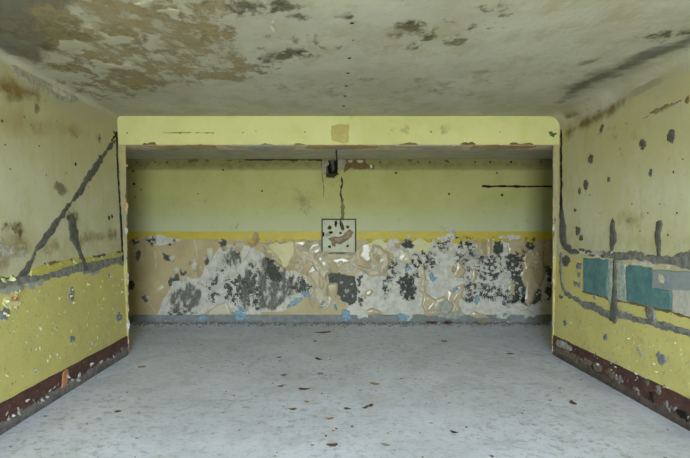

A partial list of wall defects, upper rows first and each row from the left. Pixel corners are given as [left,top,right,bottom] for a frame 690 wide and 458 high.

leakage [0,0,311,101]
crack [226,159,345,219]
peeling [321,159,374,174]
peeling [0,289,28,331]
spalling [26,273,133,404]
peeling [146,232,313,322]
peeling [347,198,690,339]
flaking render [551,328,690,422]